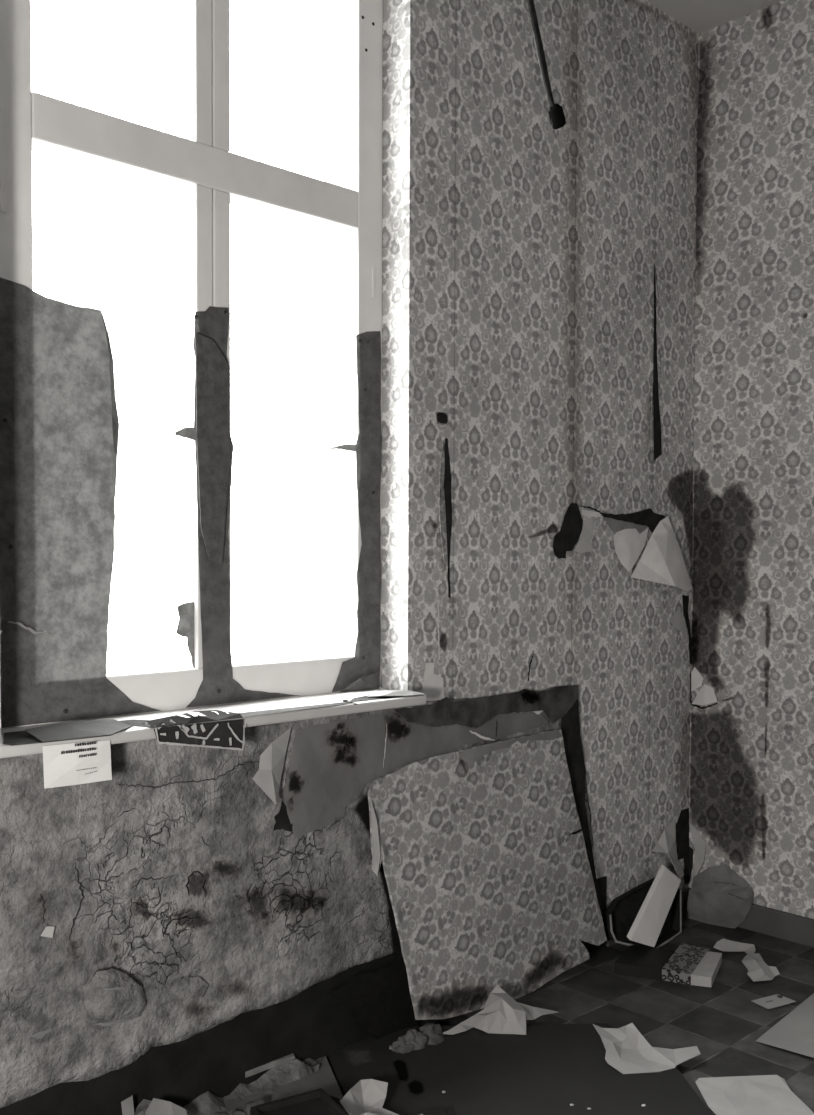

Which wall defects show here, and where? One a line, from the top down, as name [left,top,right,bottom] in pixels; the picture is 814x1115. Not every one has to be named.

spalling [536,503,603,559]
damp [668,471,753,688]
damp [329,724,356,765]
crack [116,761,260,818]
spalling [273,801,293,832]
damp [289,772,300,803]
spalling [561,685,607,944]
damp [690,714,766,861]
crack [69,862,207,940]
crack [247,857,280,915]
spalling [280,892,323,912]
peeling [41,926,55,938]